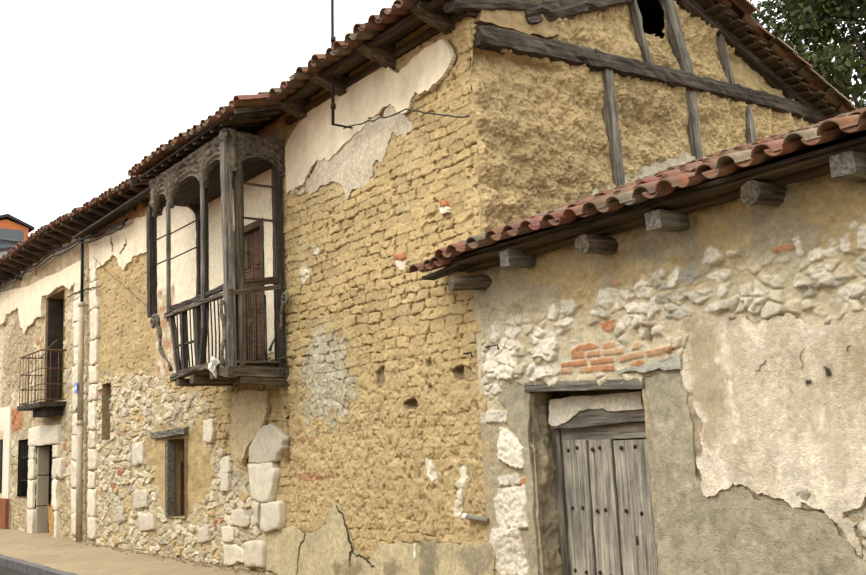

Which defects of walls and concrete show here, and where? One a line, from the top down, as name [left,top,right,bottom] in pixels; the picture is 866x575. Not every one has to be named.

flaking render [285,39,456,200]
flaking render [0,215,147,389]
flaking render [644,303,866,575]
crack [336,505,374,567]